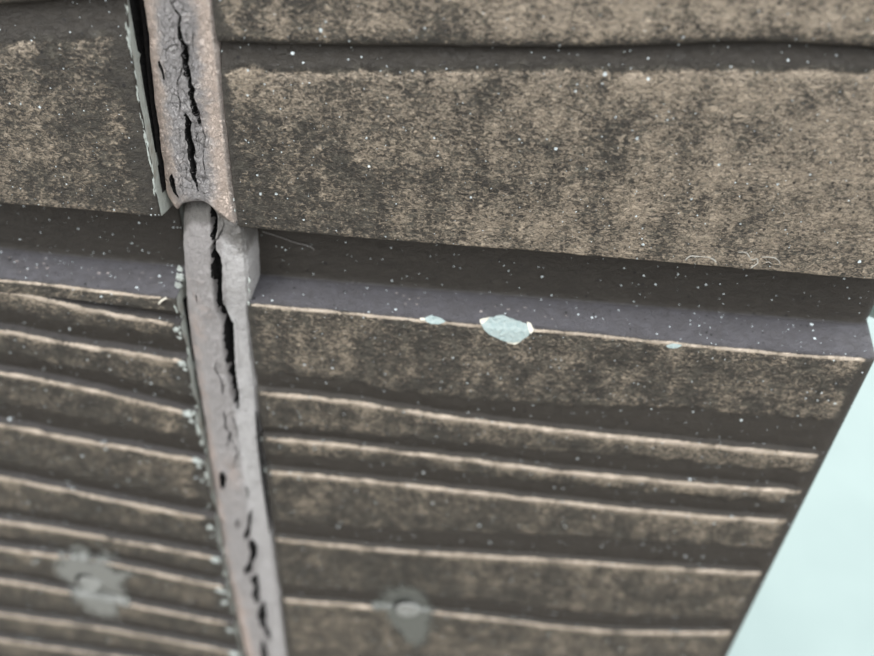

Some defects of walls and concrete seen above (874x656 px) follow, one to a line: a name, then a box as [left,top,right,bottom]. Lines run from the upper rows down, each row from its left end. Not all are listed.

crack [158,2,271,656]
peeling [480,306,534,345]